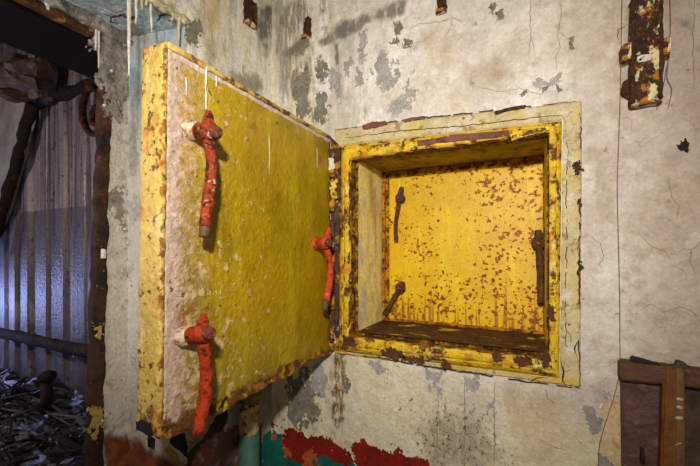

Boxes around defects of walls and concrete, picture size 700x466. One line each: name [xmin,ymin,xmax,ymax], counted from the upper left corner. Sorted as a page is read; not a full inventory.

peeling [291,20,425,130]
peeling [494,72,563,115]
peeling [677,138,689,153]
crack [643,238,700,271]
rust [208,350,345,427]
peeling [461,374,486,394]
rust [155,411,195,440]
peeling [191,424,239,466]
peeling [259,360,430,466]
peeling [583,391,621,466]